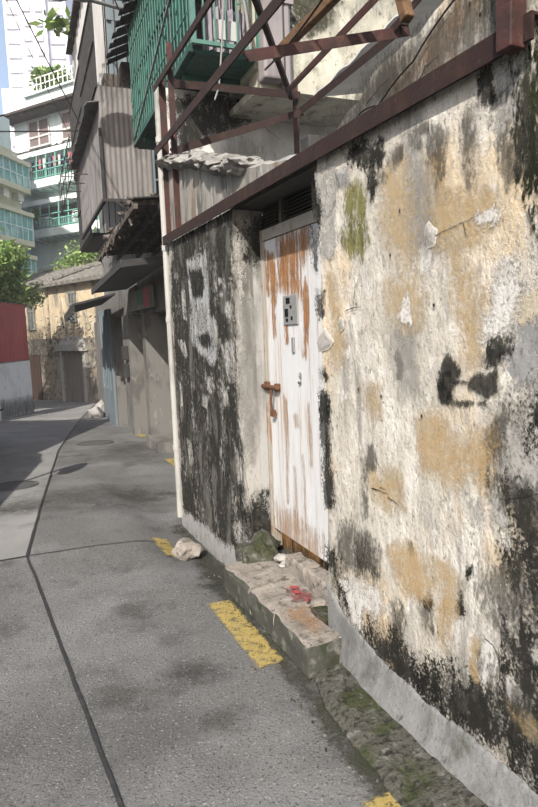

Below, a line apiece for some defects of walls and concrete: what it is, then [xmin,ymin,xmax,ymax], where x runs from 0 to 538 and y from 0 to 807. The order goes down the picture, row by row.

corrosion [264,226,310,357]
water stain [290,0,320,28]
water stain [309,180,323,272]
water stain [314,289,325,321]
water stain [306,1,343,38]
water stain [341,120,447,203]
water stain [316,0,497,142]
water stain [459,109,475,188]
water stain [497,22,538,240]
water stain [170,208,271,550]
water stain [317,366,337,510]
water stain [324,330,538,795]